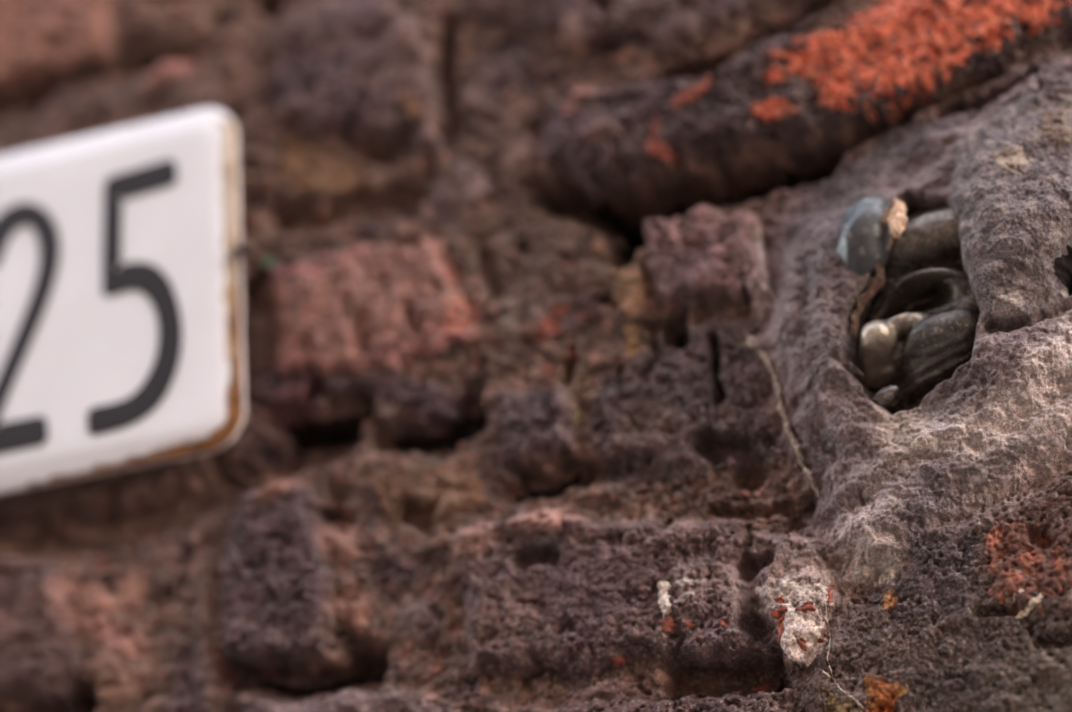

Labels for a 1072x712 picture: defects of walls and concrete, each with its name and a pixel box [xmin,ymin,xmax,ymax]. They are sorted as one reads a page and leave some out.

peeling [846,198,908,341]